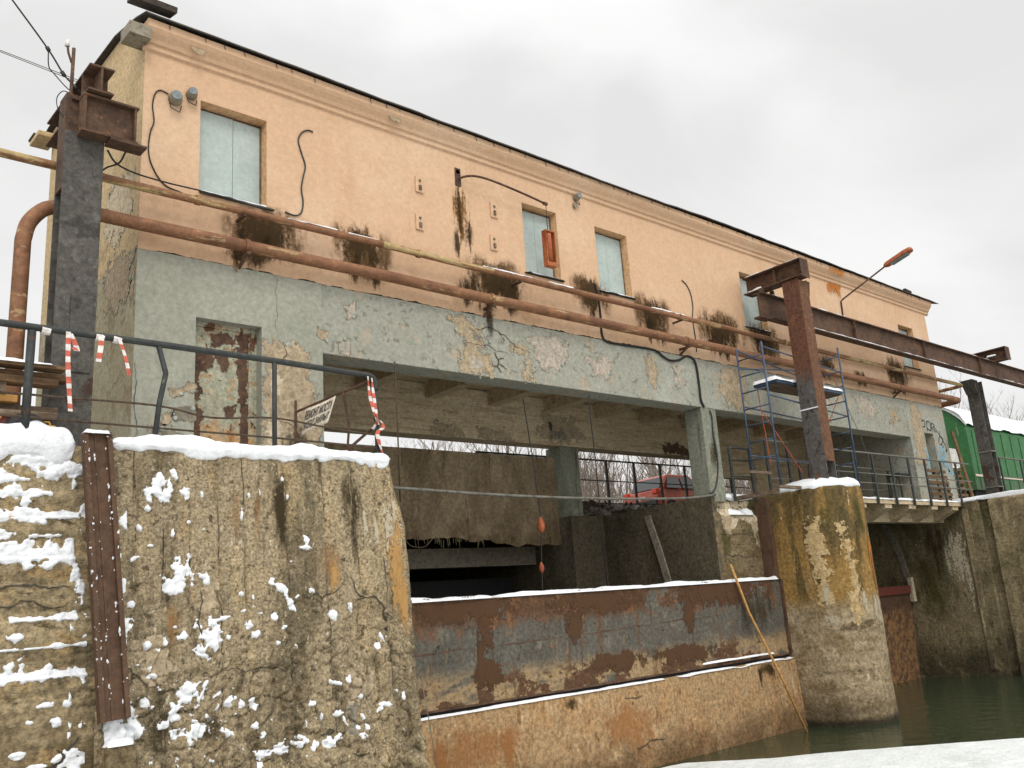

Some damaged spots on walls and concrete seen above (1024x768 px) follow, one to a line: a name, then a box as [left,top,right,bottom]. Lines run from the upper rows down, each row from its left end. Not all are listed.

damp [227,210,300,267]
damp [335,225,390,288]
damp [460,257,519,335]
peeling [259,337,323,446]
peeling [445,312,497,379]
crack [467,327,518,373]
peeling [508,332,570,384]
damp [699,312,779,360]
spalling [802,515,870,626]
crack [198,590,299,681]
crack [303,575,392,635]
corrosion [412,582,760,692]